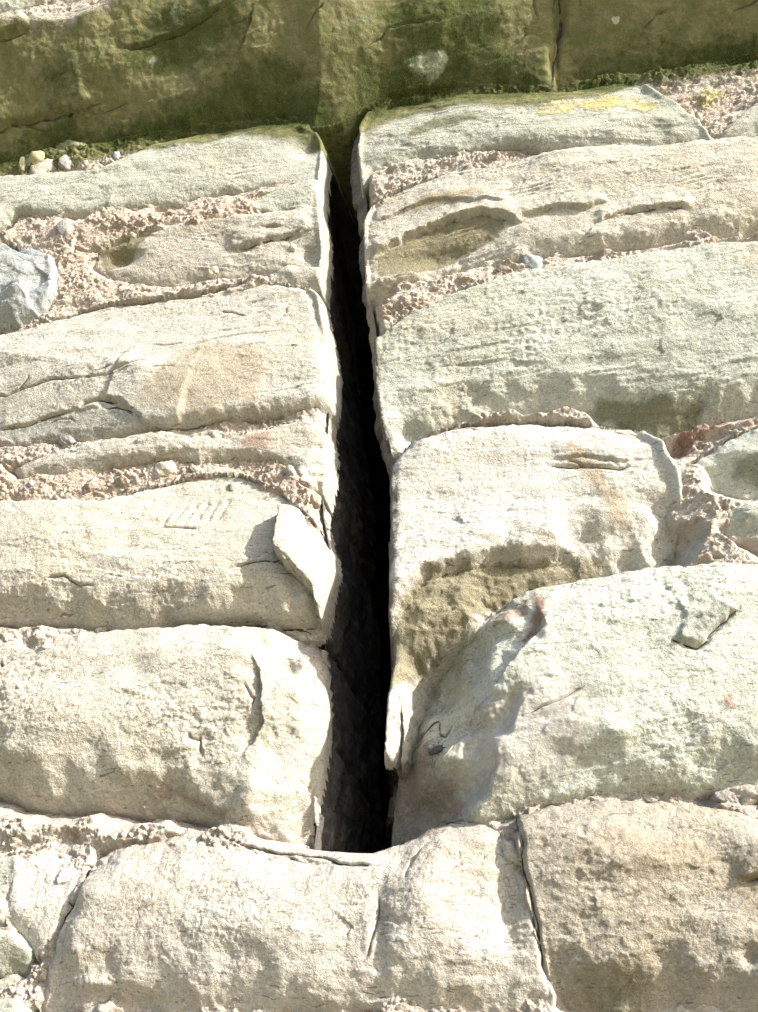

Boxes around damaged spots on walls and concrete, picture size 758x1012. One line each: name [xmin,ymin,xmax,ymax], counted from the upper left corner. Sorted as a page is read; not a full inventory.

crack [508,0,563,85]